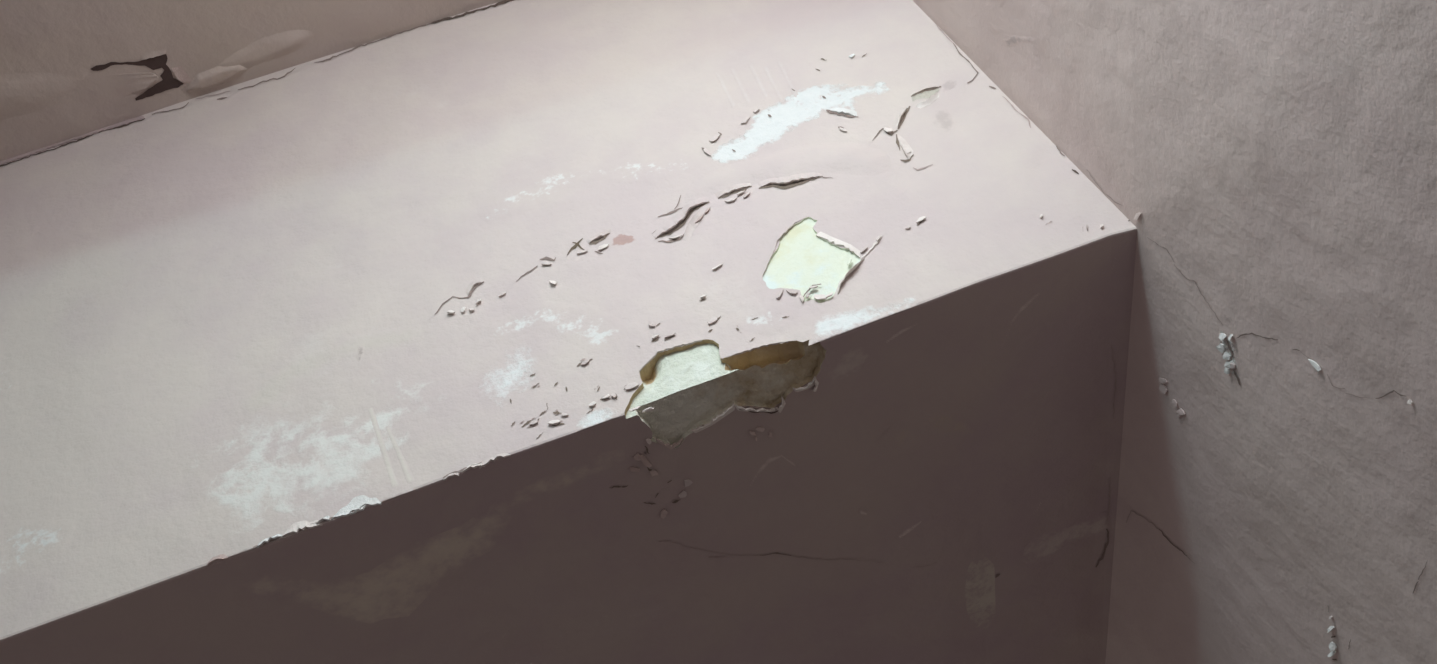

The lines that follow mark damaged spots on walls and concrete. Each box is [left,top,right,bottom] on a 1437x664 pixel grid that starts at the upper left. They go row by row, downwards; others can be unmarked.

crack [0,0,513,167]
peeling [761,213,882,303]
crack [872,23,1413,404]
peeling [511,404,569,439]
spalling [586,316,827,519]
crack [1096,477,1195,568]